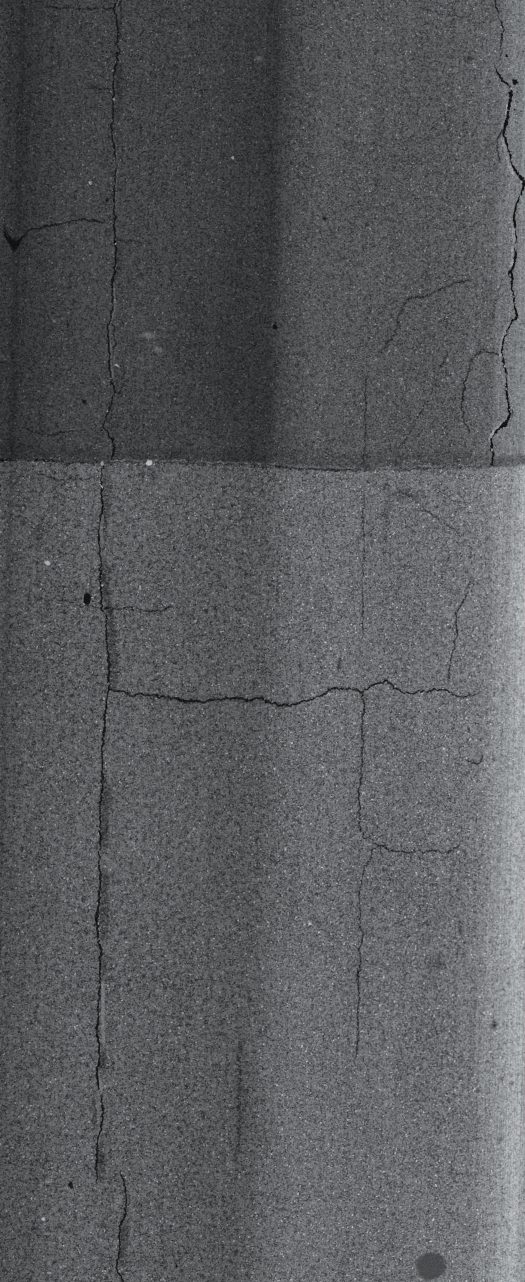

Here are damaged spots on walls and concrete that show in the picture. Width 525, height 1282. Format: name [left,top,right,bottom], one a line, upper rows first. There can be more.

crack [3,0,129,459]
crack [407,0,525,466]
crack [59,465,476,1183]
crack [115,1172,127,1282]